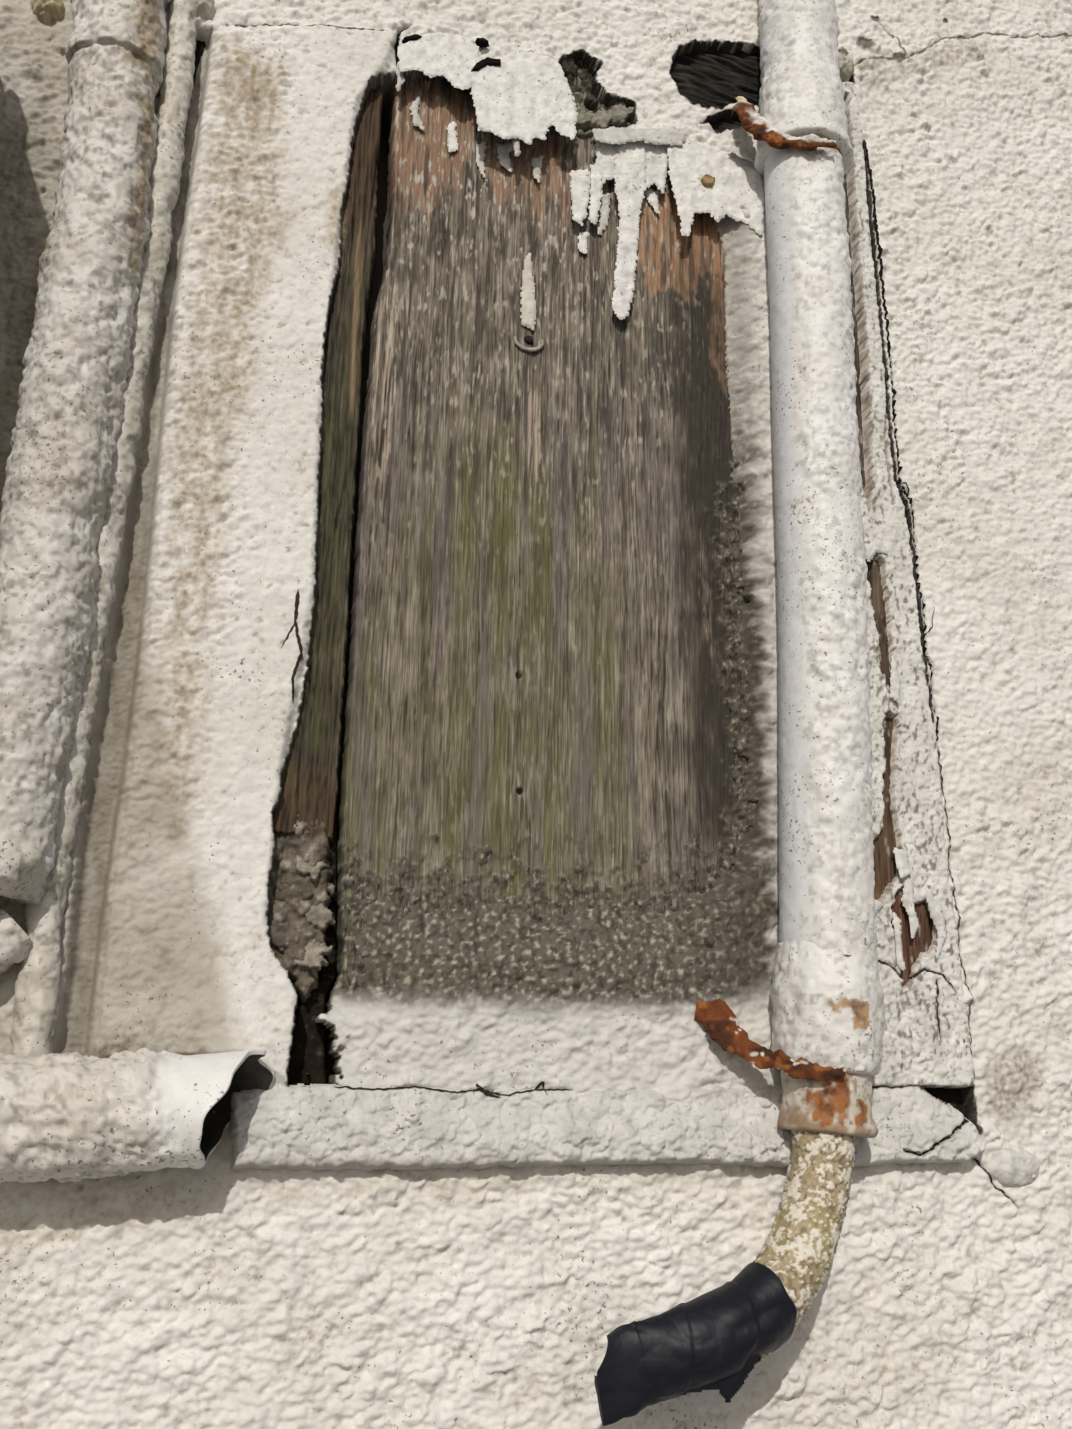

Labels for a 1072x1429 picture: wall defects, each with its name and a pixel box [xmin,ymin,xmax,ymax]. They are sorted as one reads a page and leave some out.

crack [855,25,1071,65]
peeling [395,32,765,320]
peeling [865,539,901,703]
crack [862,139,1016,1205]
flaking render [267,814,335,1005]
crack [287,817,569,1098]
corrosion [806,1075,867,1126]
corrosion [831,998,870,1028]
peeling [873,718,947,987]